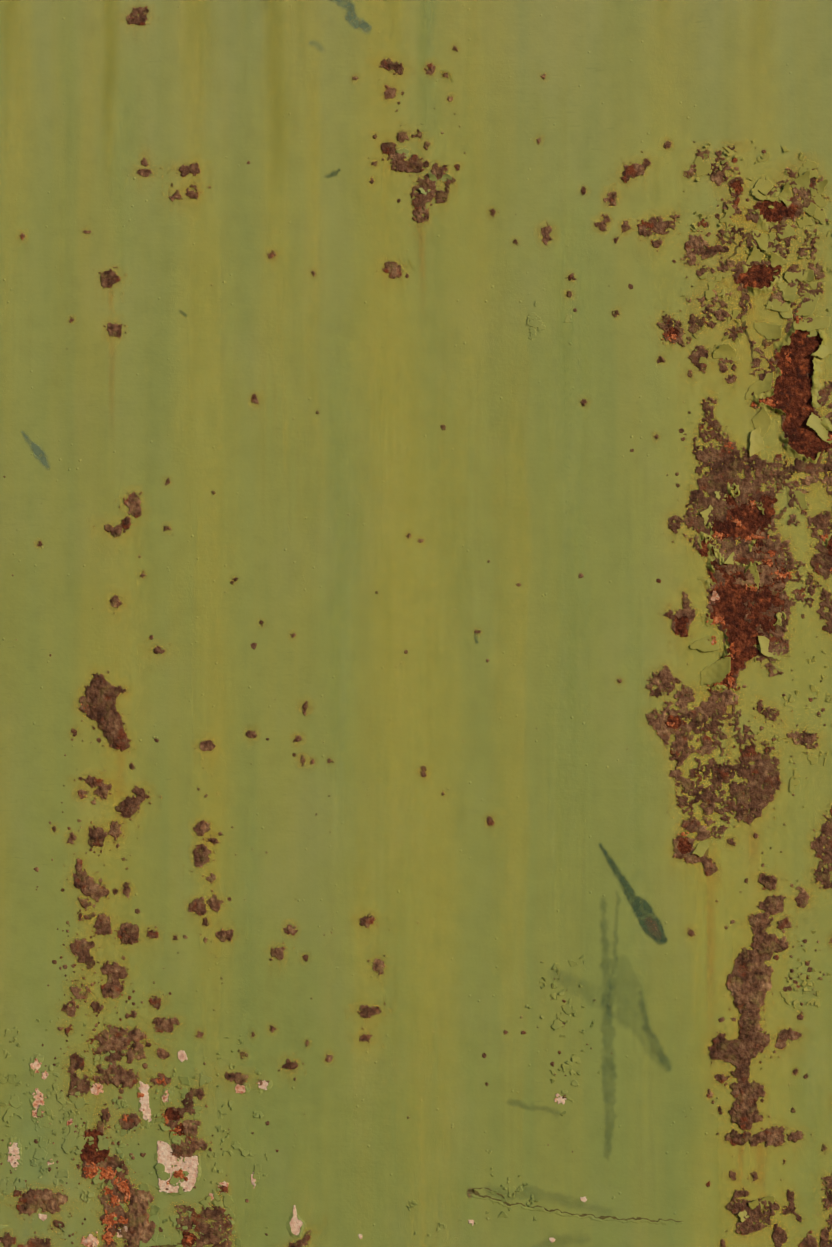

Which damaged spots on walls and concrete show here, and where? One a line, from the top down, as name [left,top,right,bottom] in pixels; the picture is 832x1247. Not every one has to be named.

rust [368,58,466,223]
rust [594,151,680,252]
peeling [691,143,832,300]
rust [645,141,832,1247]
peeling [7,1134,23,1170]
peeling [14,1037,272,1247]
peeling [286,1205,307,1240]